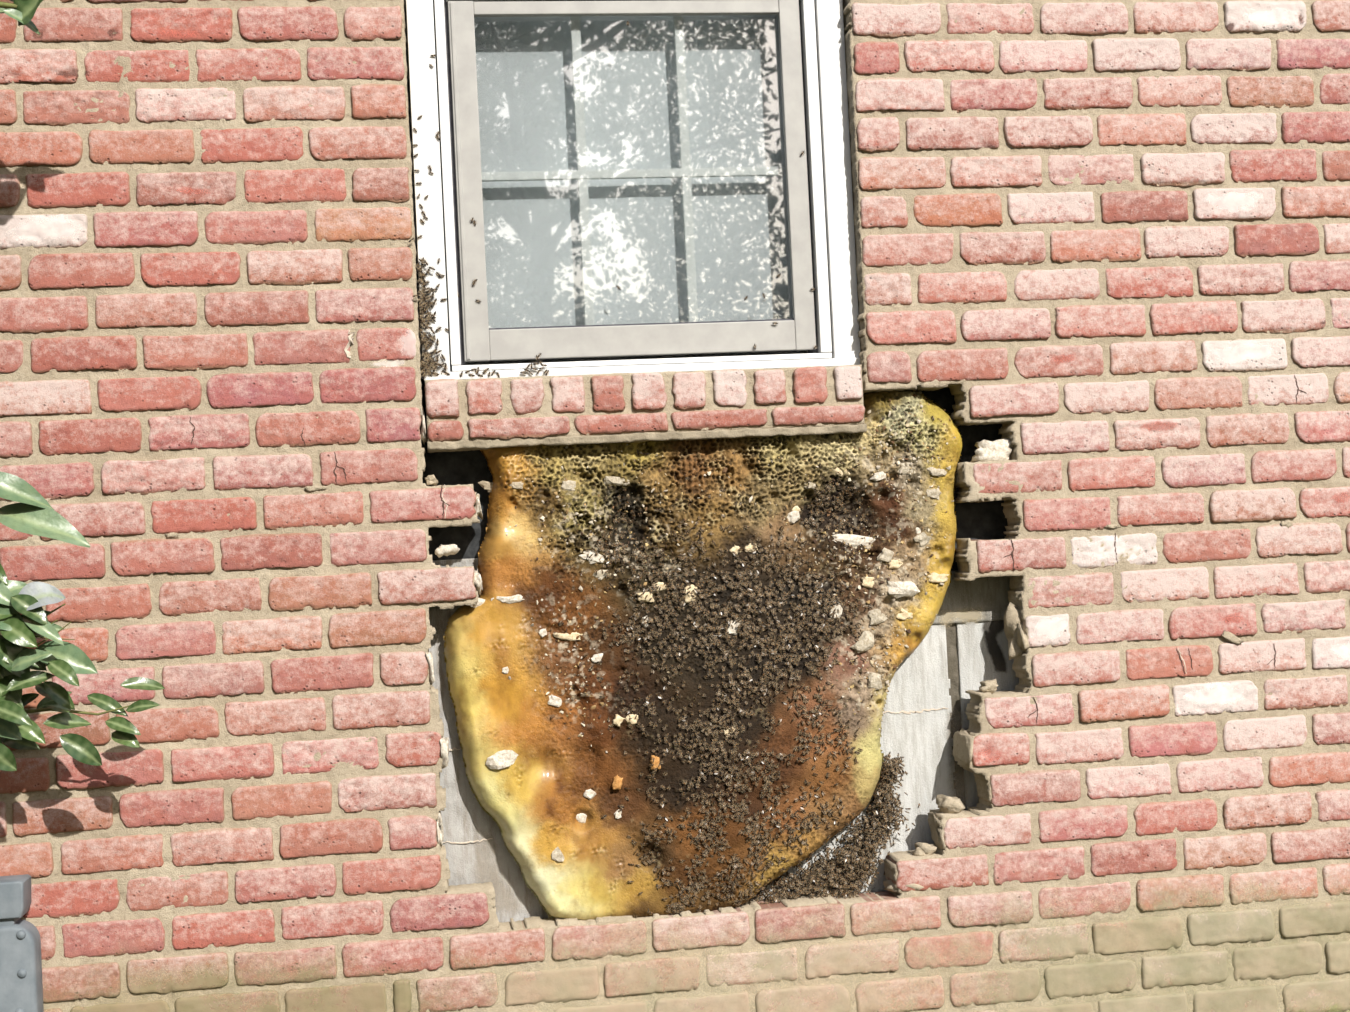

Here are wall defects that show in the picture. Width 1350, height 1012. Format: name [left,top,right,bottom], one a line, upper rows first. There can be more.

crack [301,428,347,483]
crack [440,484,450,519]
spalling [787,506,801,524]
peeling [729,543,758,554]
spalling [579,551,608,580]
peeling [636,582,666,627]
spalling [850,548,949,653]
peeling [539,629,583,641]
crack [1176,648,1193,674]
peeling [612,714,638,727]
spalling [486,750,518,769]
spalling [576,789,596,823]